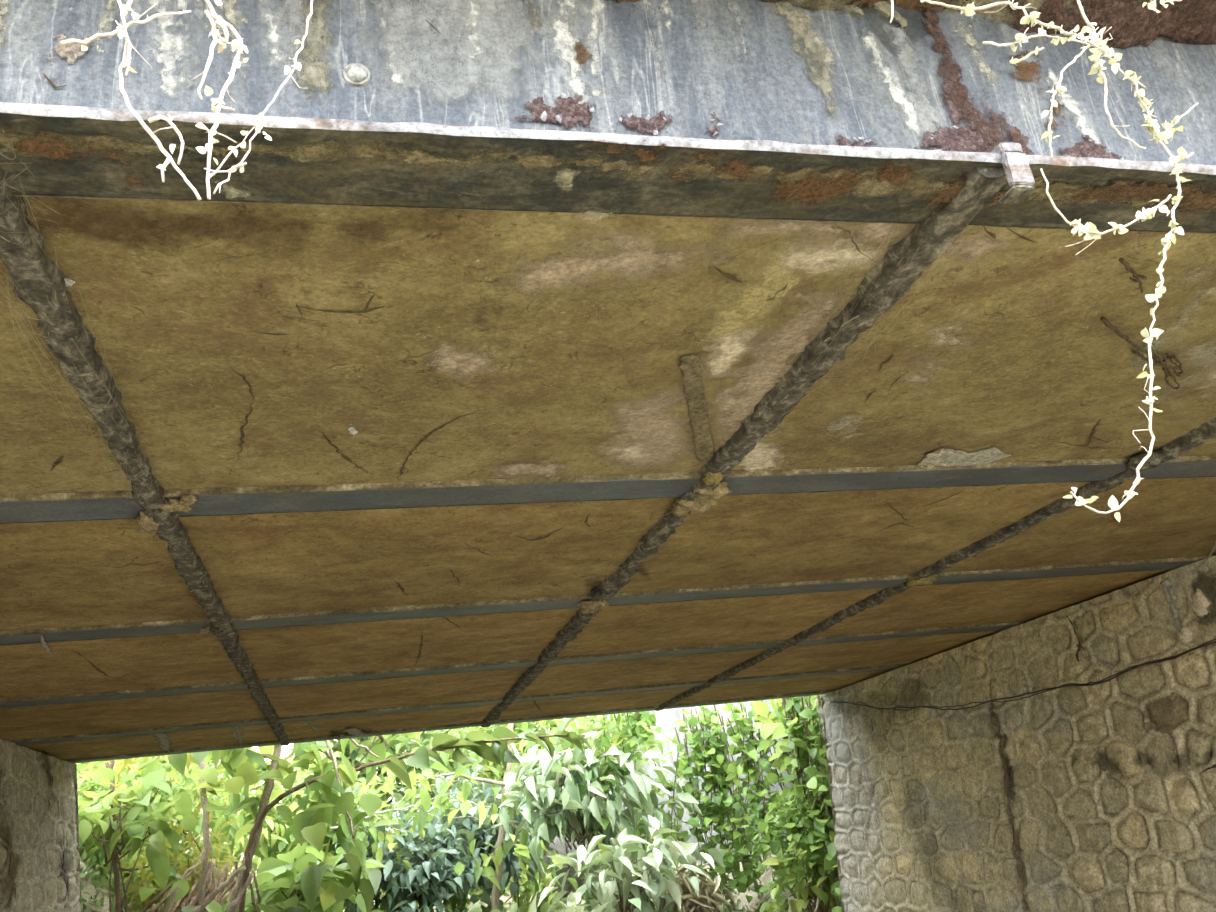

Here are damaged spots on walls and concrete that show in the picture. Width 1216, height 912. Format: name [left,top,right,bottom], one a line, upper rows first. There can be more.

corrosion [1007,0,1216,49]
corrosion [851,0,1034,155]
corrosion [772,163,919,208]
crack [233,370,255,458]
crack [317,426,367,473]
crack [397,409,487,482]
flaking render [918,447,1012,467]